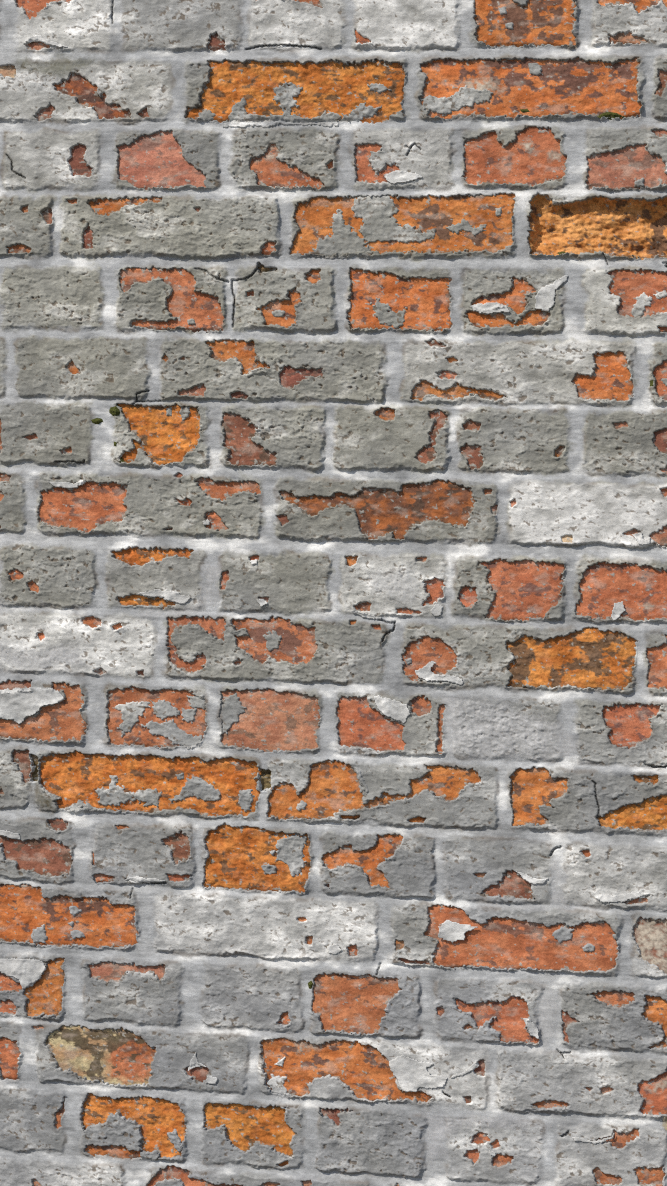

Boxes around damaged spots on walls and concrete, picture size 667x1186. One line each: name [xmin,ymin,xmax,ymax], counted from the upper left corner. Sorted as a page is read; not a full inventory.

peeling [185,33,405,128]
peeling [67,131,206,216]
peeling [247,0,667,470]
peeling [120,266,323,389]
peeling [118,384,261,531]
peeling [39,480,128,533]
peeling [277,479,516,540]
peeling [118,589,318,673]
peeling [458,559,565,621]
peeling [506,562,667,690]
peeling [0,670,485,1186]
peeling [395,904,619,972]